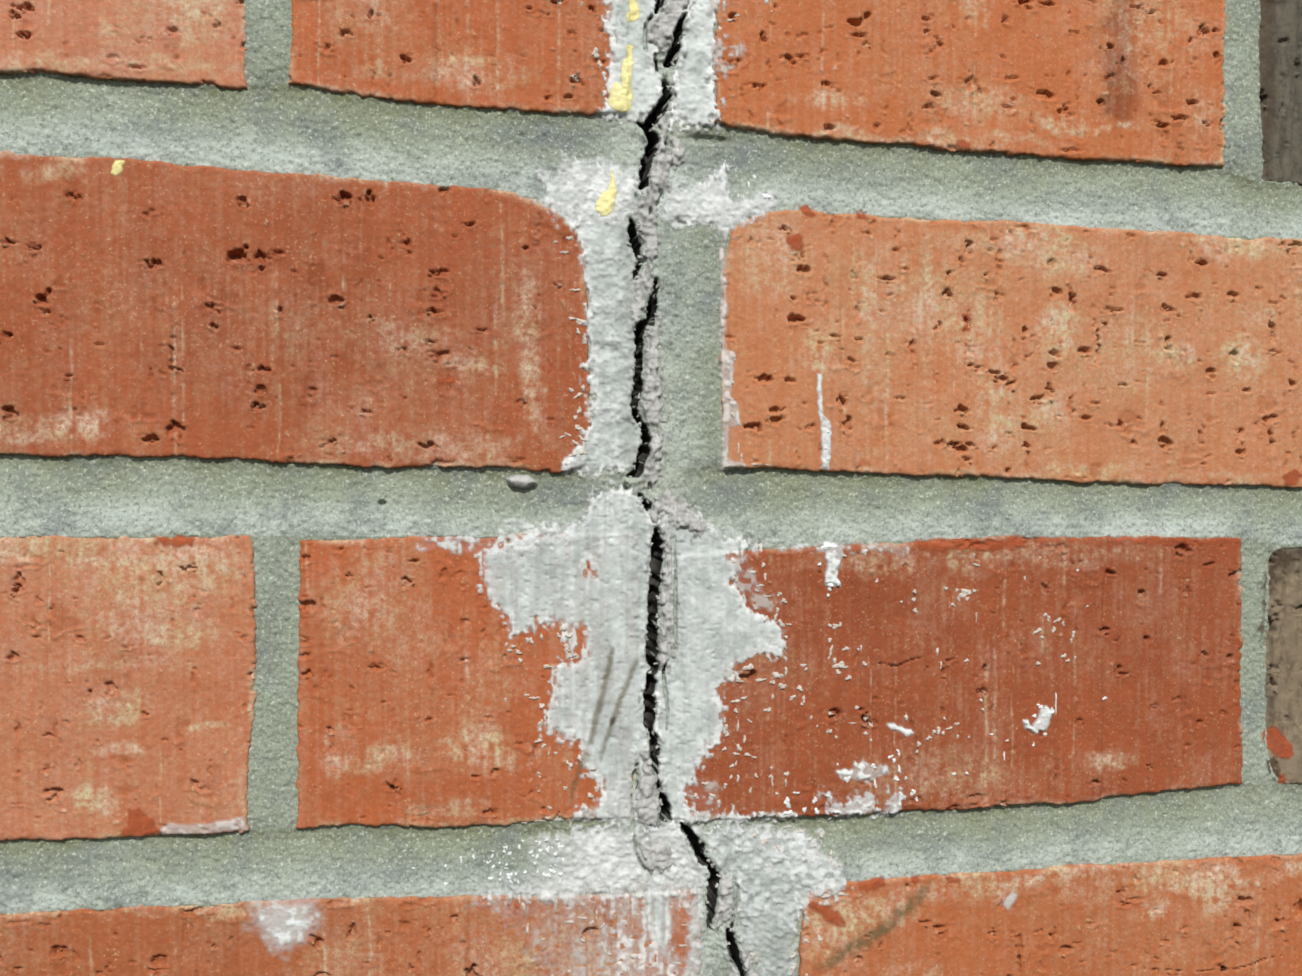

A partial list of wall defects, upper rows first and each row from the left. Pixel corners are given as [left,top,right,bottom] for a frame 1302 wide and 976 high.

crack [627,0,748,976]